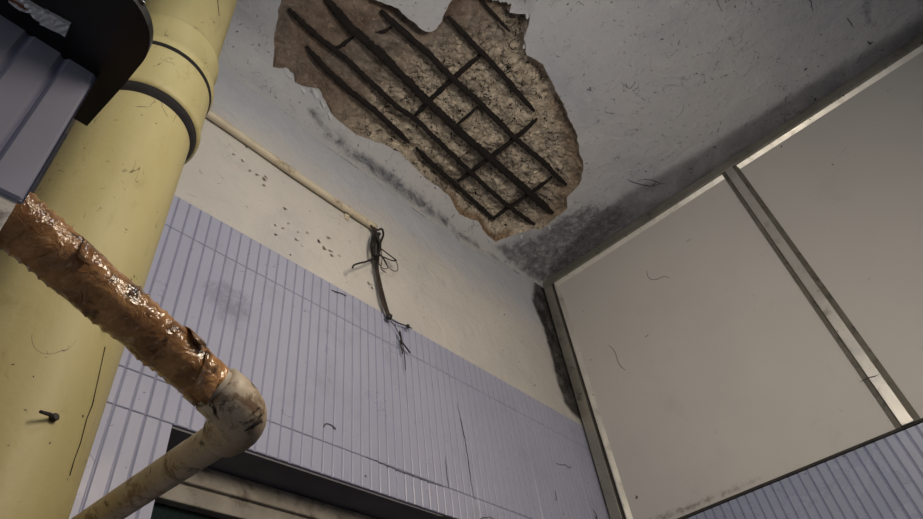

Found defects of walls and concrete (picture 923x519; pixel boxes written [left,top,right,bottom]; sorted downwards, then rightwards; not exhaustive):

damp [353,154,447,225]
spalling [273,0,583,243]
damp [503,209,620,419]